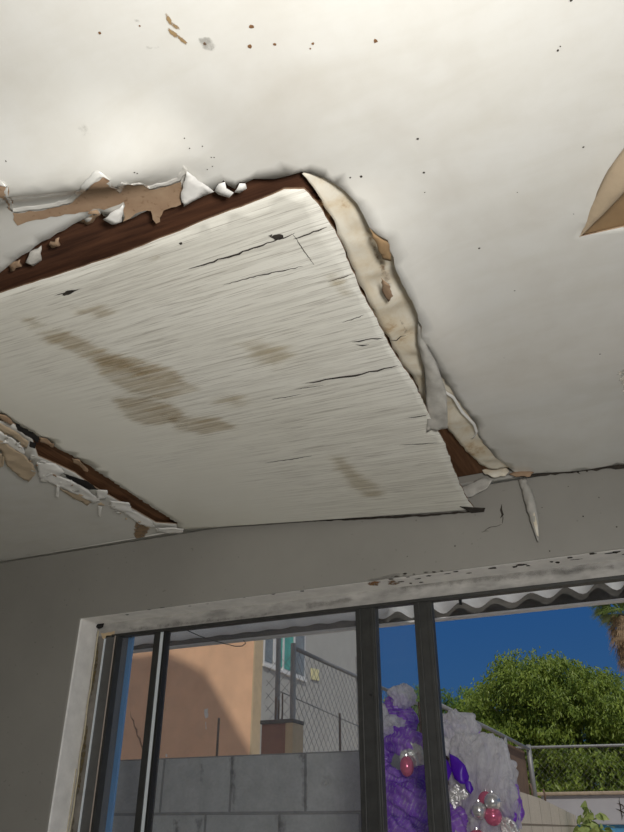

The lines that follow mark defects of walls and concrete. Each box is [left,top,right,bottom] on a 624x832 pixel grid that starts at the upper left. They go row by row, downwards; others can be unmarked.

peeling [0,165,247,226]
peeling [580,149,624,237]
crack [189,227,326,285]
crack [275,365,398,399]
flaking render [0,431,25,454]
flaking render [36,462,184,534]